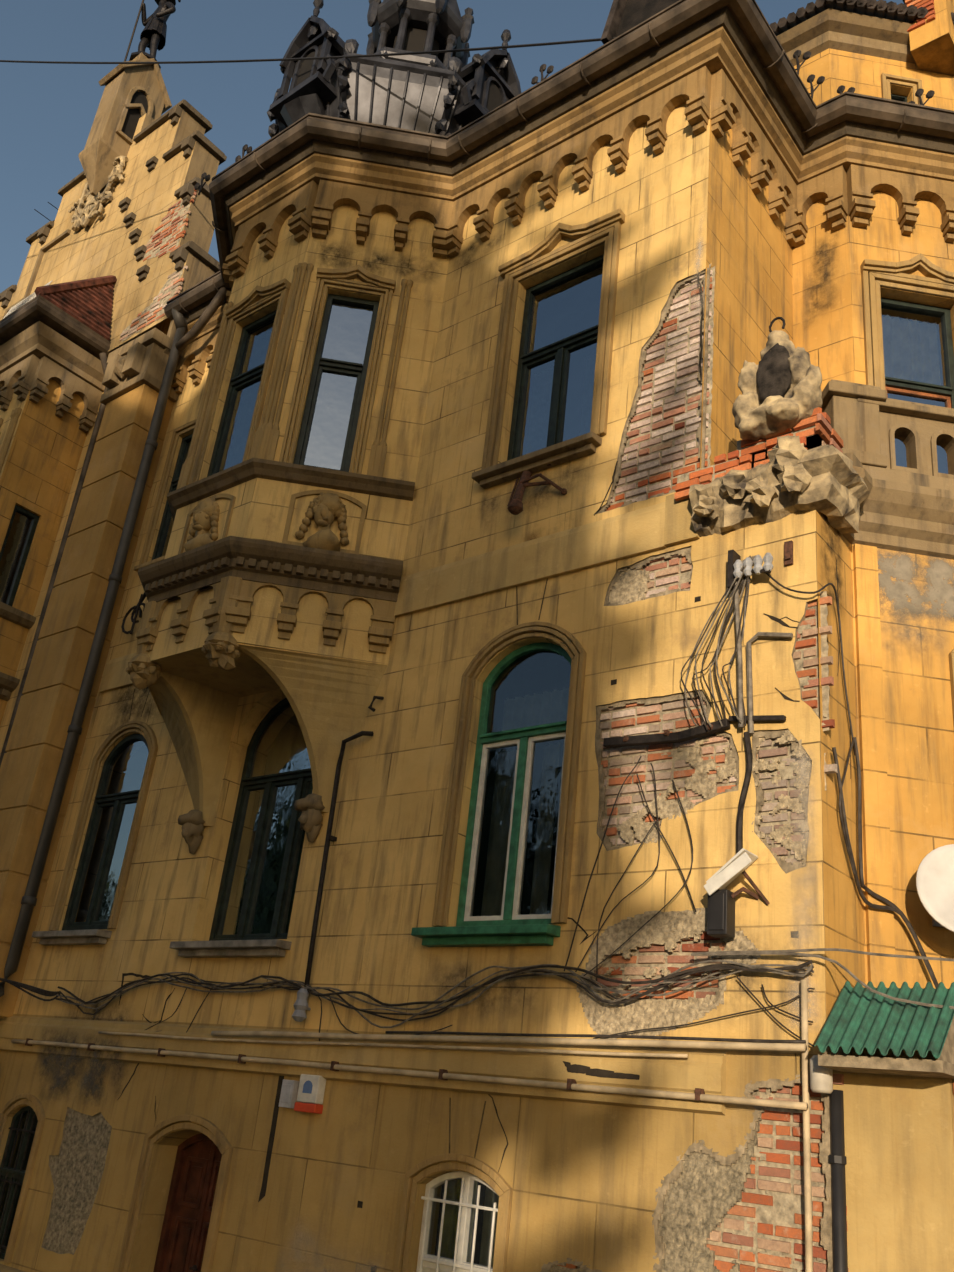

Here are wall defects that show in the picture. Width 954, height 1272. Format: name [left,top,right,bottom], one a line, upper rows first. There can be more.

flaking render [905,0,936,32]
flaking render [141,189,197,262]
flaking render [119,266,188,342]
flaking render [597,263,715,514]
flaking render [605,547,701,606]
spalling [793,591,835,731]
flaking render [596,690,837,874]
flaking render [576,908,761,1039]
spalling [563,1061,640,1080]
flaking render [43,1108,112,1254]
flaking render [652,1071,850,1272]
flaking render [537,1258,602,1272]